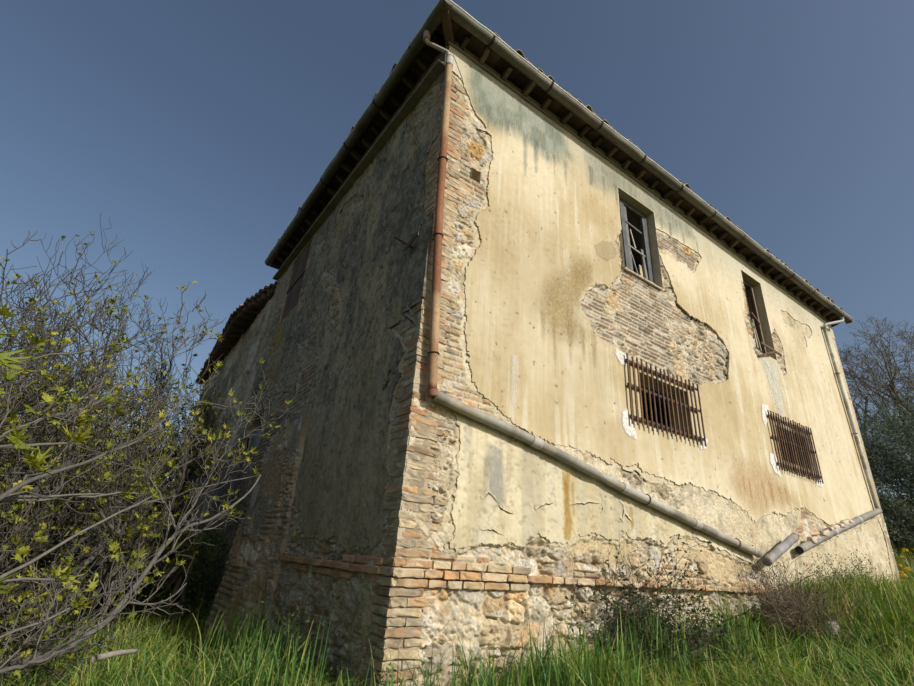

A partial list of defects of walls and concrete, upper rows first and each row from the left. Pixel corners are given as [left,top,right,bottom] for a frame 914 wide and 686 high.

spalling [400,72,900,686]